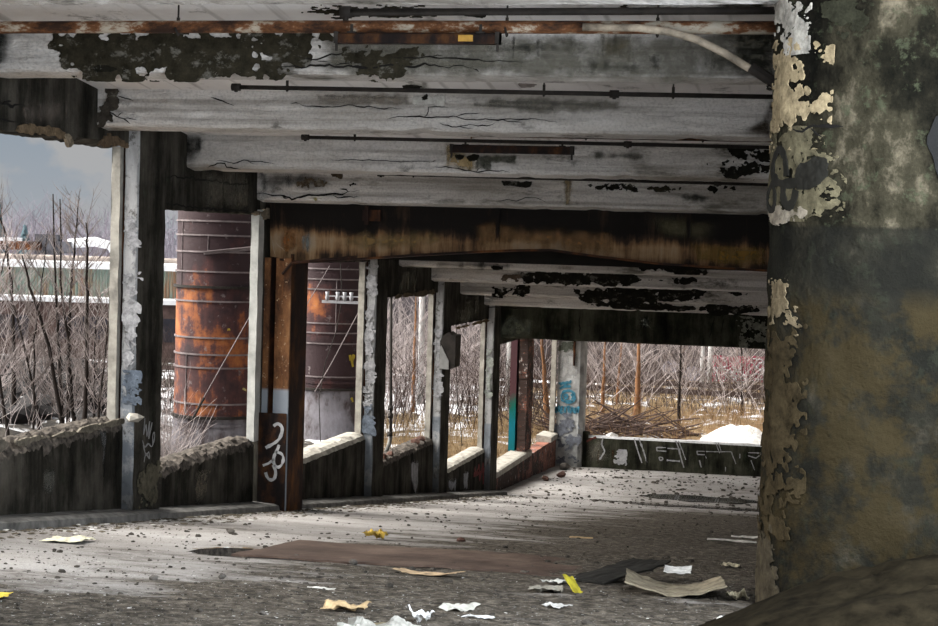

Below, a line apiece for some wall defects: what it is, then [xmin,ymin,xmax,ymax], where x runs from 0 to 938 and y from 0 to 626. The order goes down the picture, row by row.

peeling [48,33,333,148]
peeling [342,45,428,100]
crack [291,102,554,129]
peeling [772,0,835,65]
peeling [707,116,847,226]
peeling [121,216,143,405]
spalling [0,418,125,452]
peeling [491,265,808,603]